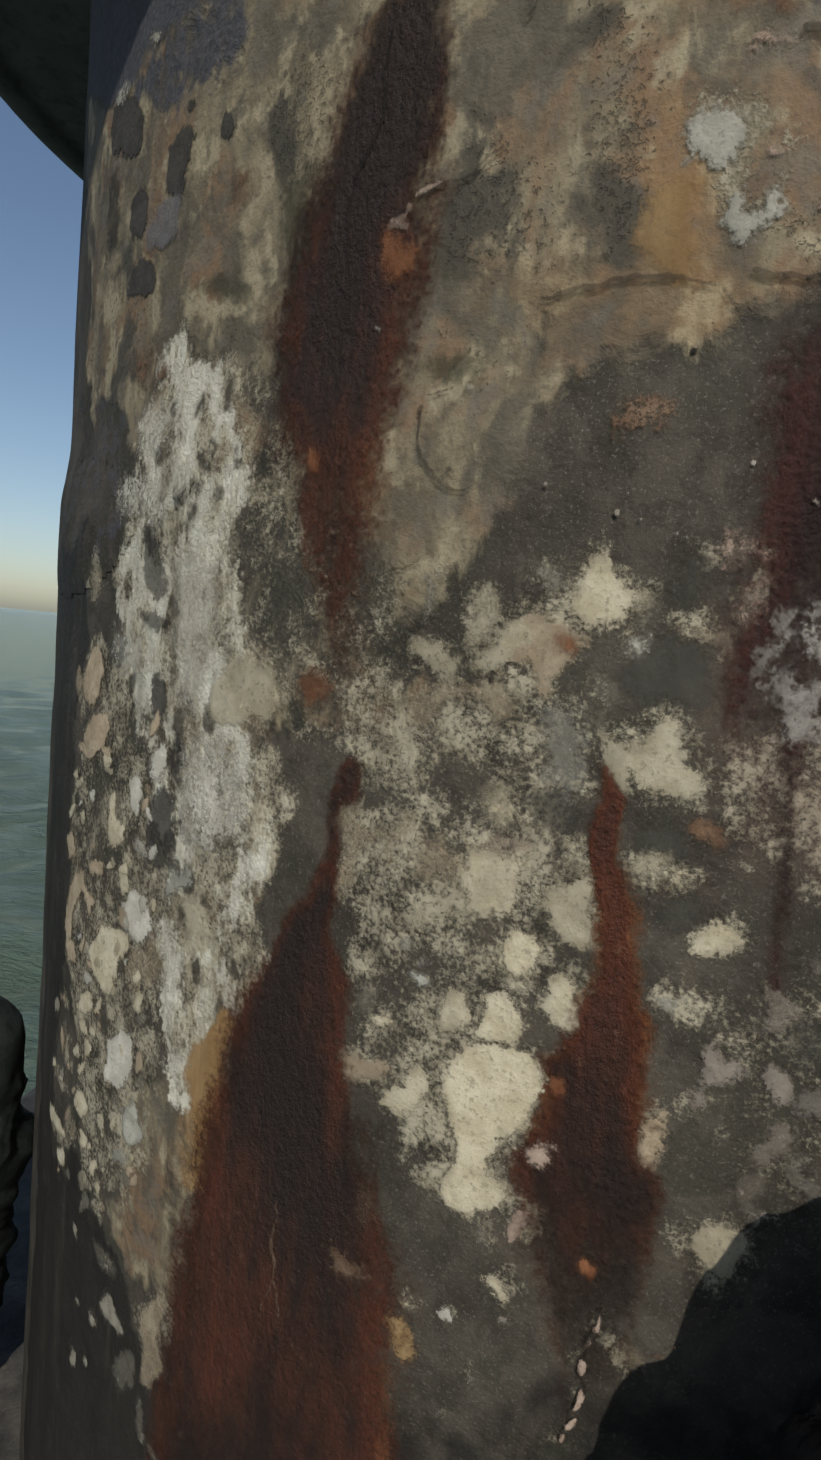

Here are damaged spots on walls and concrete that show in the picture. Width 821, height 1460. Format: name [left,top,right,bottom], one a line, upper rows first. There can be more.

rust [270,0,453,608]
damp [116,474,168,524]
damp [622,635,712,708]
damp [177,736,253,855]
rust [182,1009,235,1190]
rust [510,766,664,1352]